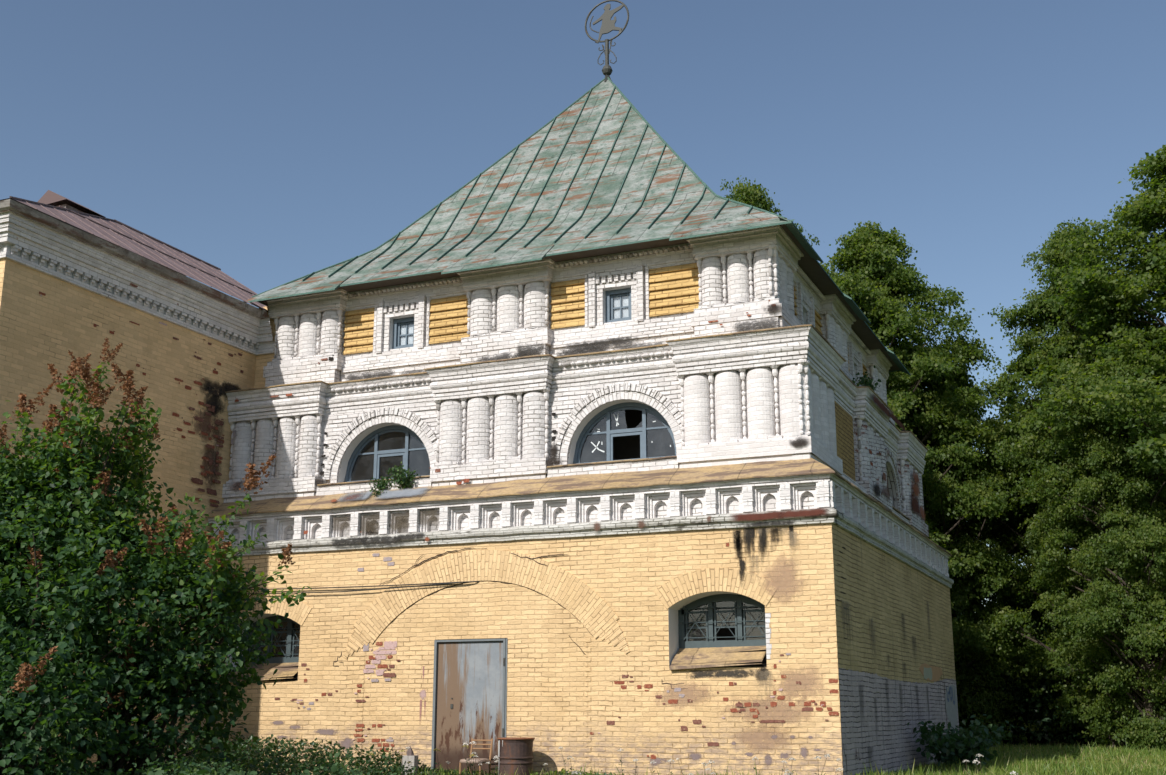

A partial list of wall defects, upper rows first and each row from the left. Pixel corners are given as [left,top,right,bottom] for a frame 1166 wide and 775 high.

water stain [734,526,793,580]
crack [380,548,593,655]
peeling [275,690,338,710]
peeling [354,641,400,702]
peeling [614,675,698,705]
peeling [690,653,839,765]